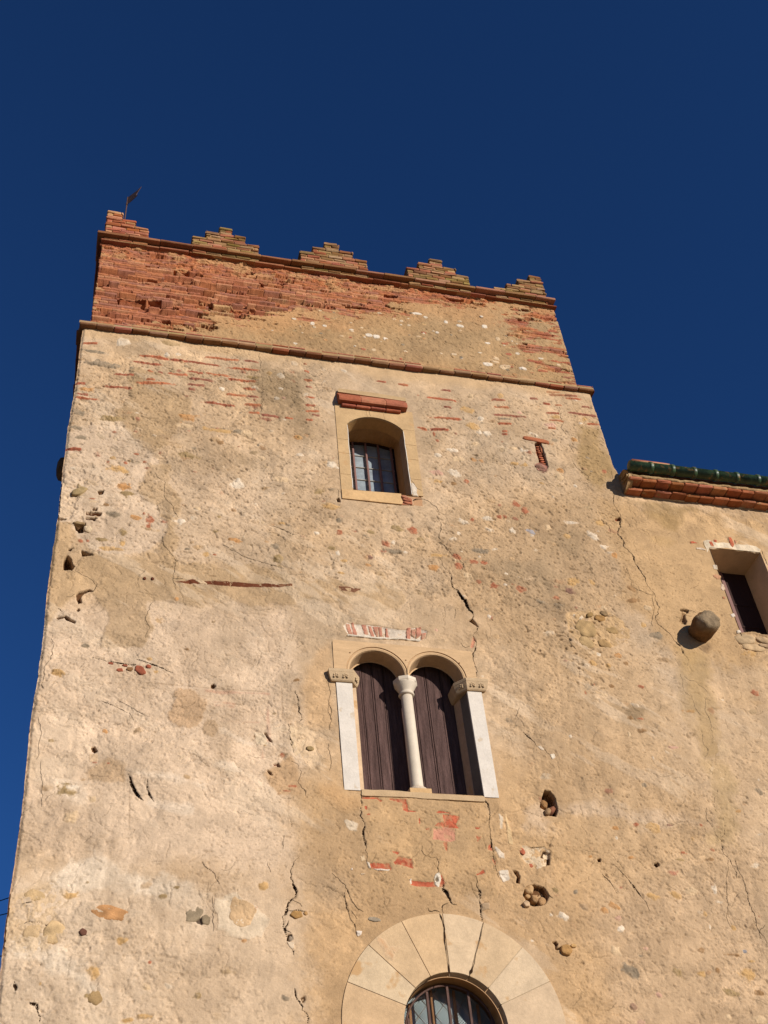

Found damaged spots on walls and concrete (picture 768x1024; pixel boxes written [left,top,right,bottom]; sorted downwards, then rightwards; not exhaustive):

spalling [116,299,161,310]
spalling [56,549,97,624]
crack [403,434,478,677]
crack [560,409,767,941]
crack [360,794,368,858]
spalling [540,792,556,817]
crack [334,875,364,928]
crack [422,800,498,977]
flaking render [513,845,553,908]